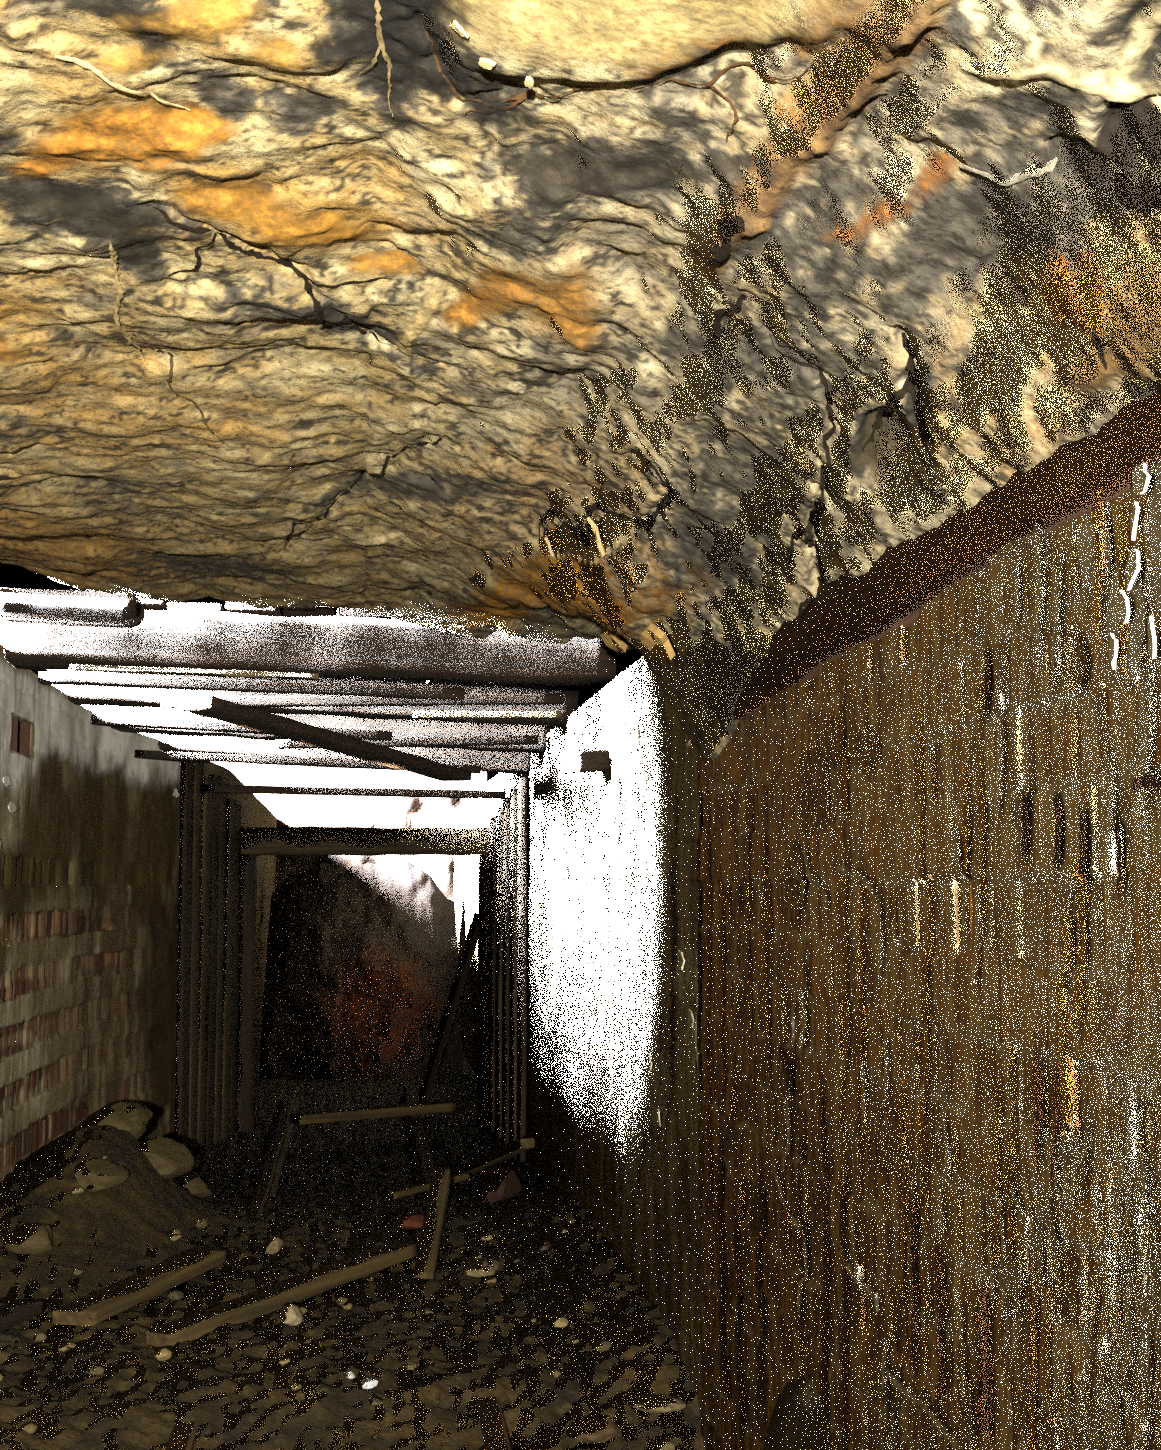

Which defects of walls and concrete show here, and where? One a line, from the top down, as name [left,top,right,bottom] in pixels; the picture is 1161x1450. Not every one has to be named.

damp [0,751,174,973]